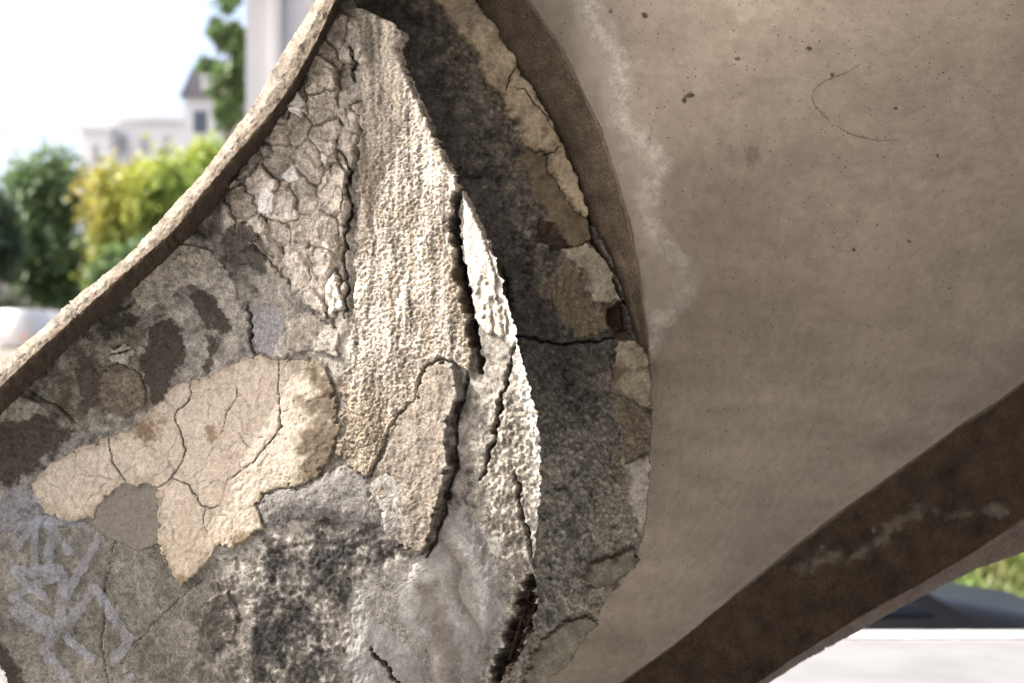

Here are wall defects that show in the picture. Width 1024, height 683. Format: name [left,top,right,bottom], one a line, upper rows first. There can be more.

crack [350,48,358,79]
peeling [433,0,589,217]
crack [505,68,560,156]
efflorescence [579,0,695,356]
crack [343,155,354,311]
spalling [534,221,569,250]
peeling [30,8,509,587]
peeling [0,395,42,424]
crack [435,202,621,554]
spalling [0,646,23,683]
rust [502,592,538,679]
crack [504,580,537,669]